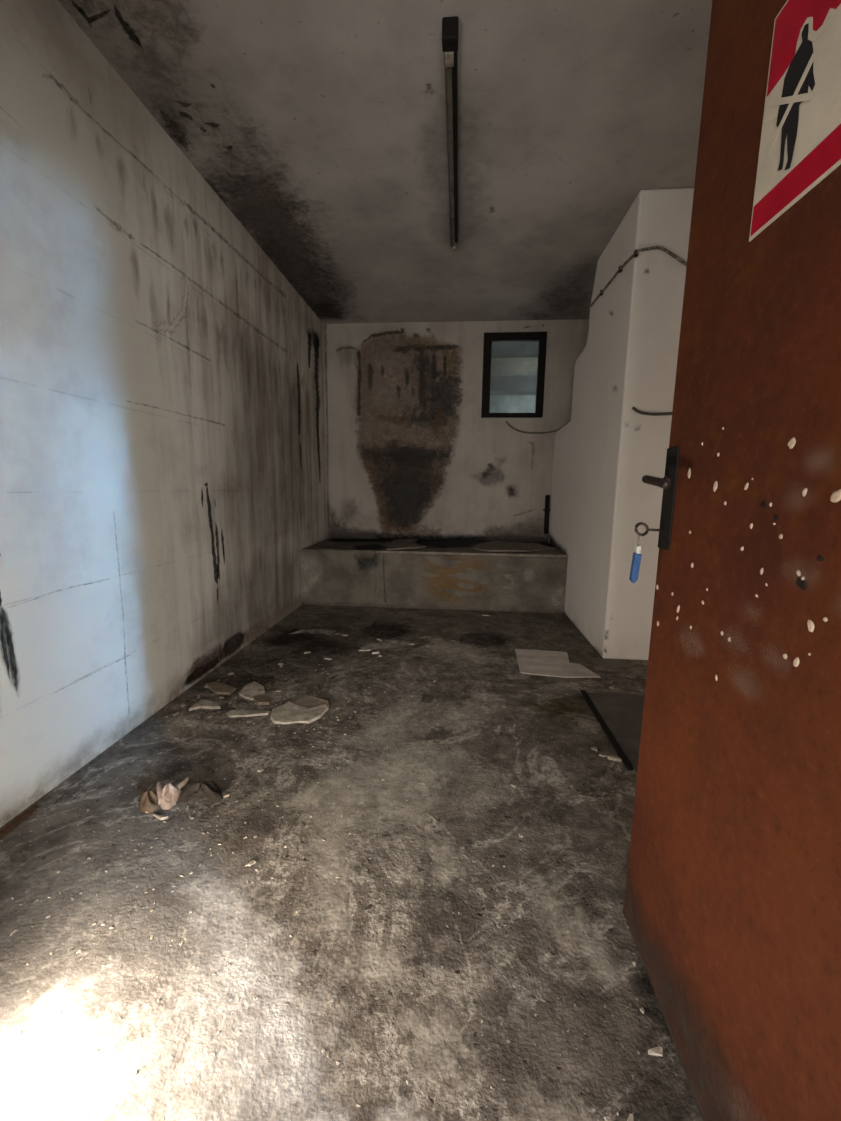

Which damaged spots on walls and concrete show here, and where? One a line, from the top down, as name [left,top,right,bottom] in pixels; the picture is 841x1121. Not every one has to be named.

leakage [205,146,352,482]
leakage [328,329,566,553]
peeling [0,592,18,690]